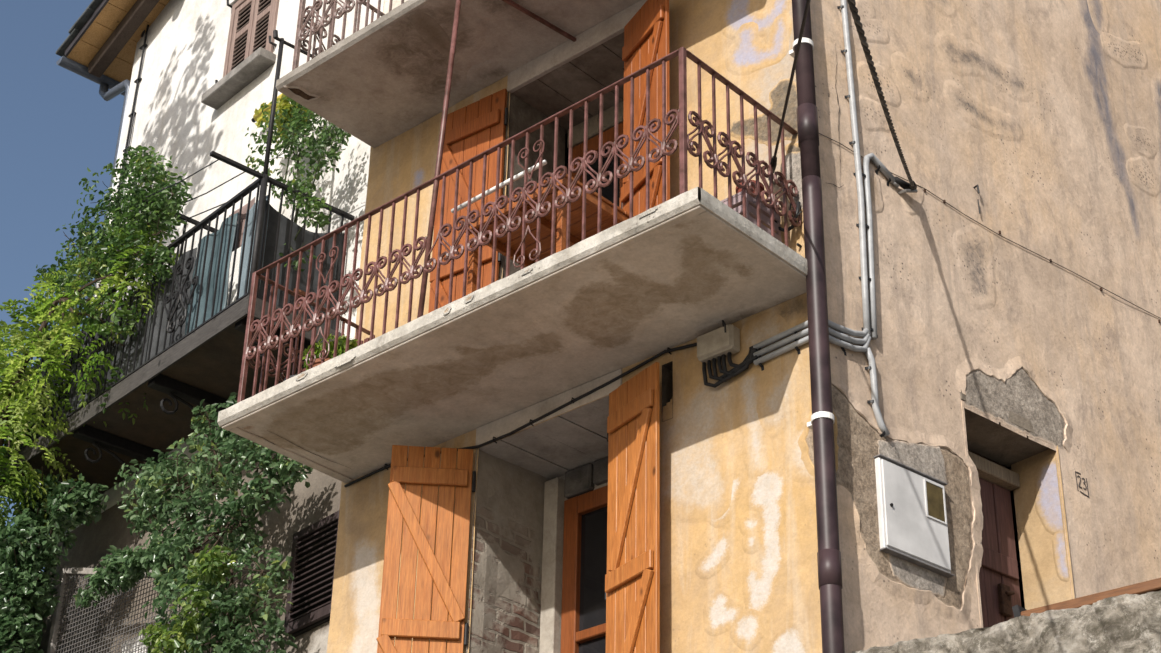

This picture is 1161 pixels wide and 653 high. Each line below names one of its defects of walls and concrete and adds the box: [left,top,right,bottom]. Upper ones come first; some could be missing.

damp [361,0,538,108]
peeling [720,0,803,232]
damp [1075,0,1144,246]
damp [252,214,762,458]
damp [660,290,814,524]
peeling [695,465,813,653]
flaking render [798,413,815,484]
flaking render [831,374,983,624]
damp [952,223,997,310]
flaking render [955,356,1073,582]